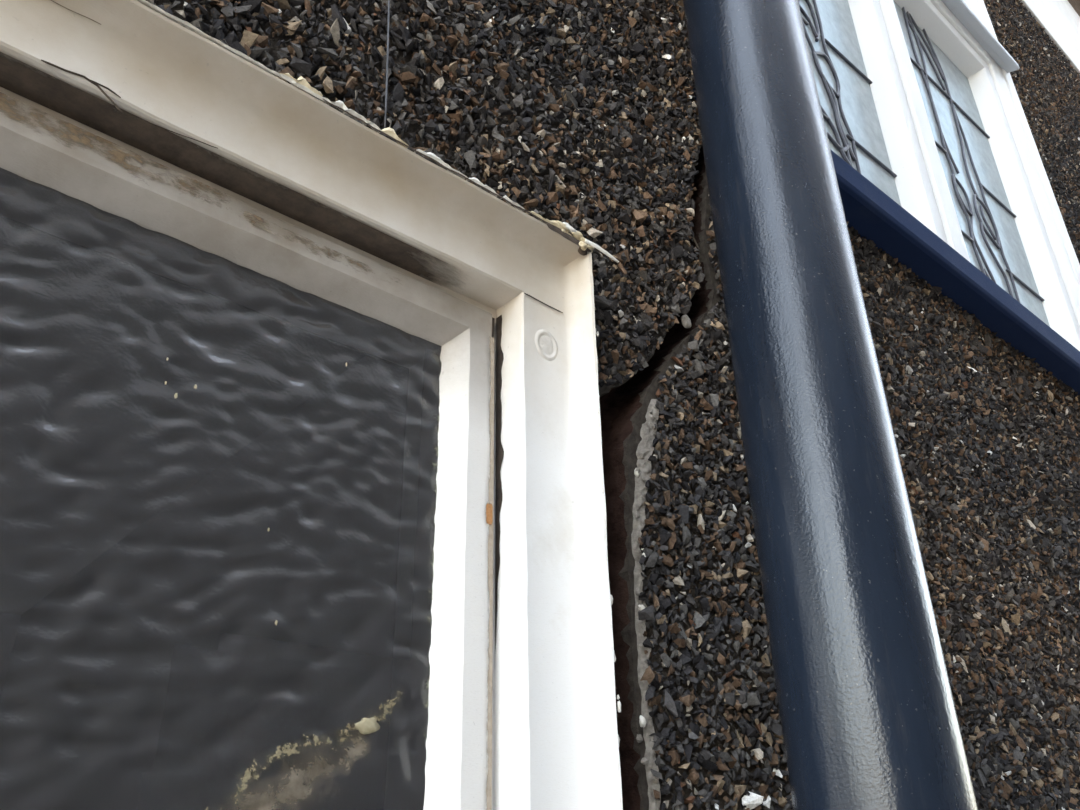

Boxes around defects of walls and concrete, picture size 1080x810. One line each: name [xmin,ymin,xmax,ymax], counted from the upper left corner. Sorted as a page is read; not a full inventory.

crack [614,147,712,398]
flaking render [631,399,661,810]